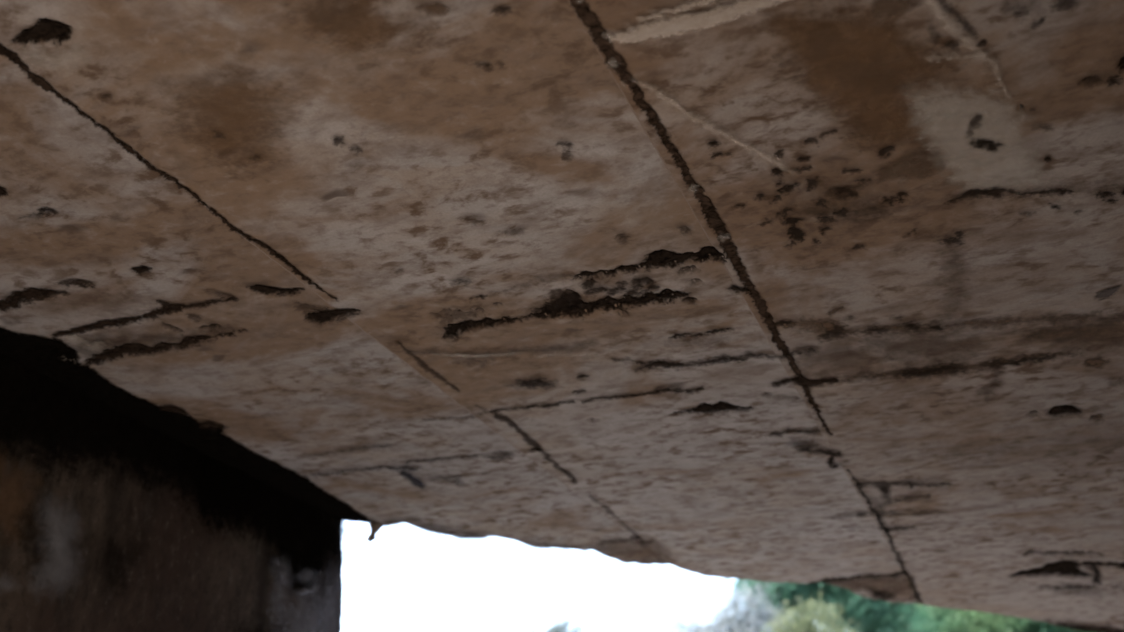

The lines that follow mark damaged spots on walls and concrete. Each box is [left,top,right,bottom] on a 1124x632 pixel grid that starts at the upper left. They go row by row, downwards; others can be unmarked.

spalling [12,18,72,45]
crack [0,279,94,311]
crack [52,297,245,366]
crack [769,428,818,437]